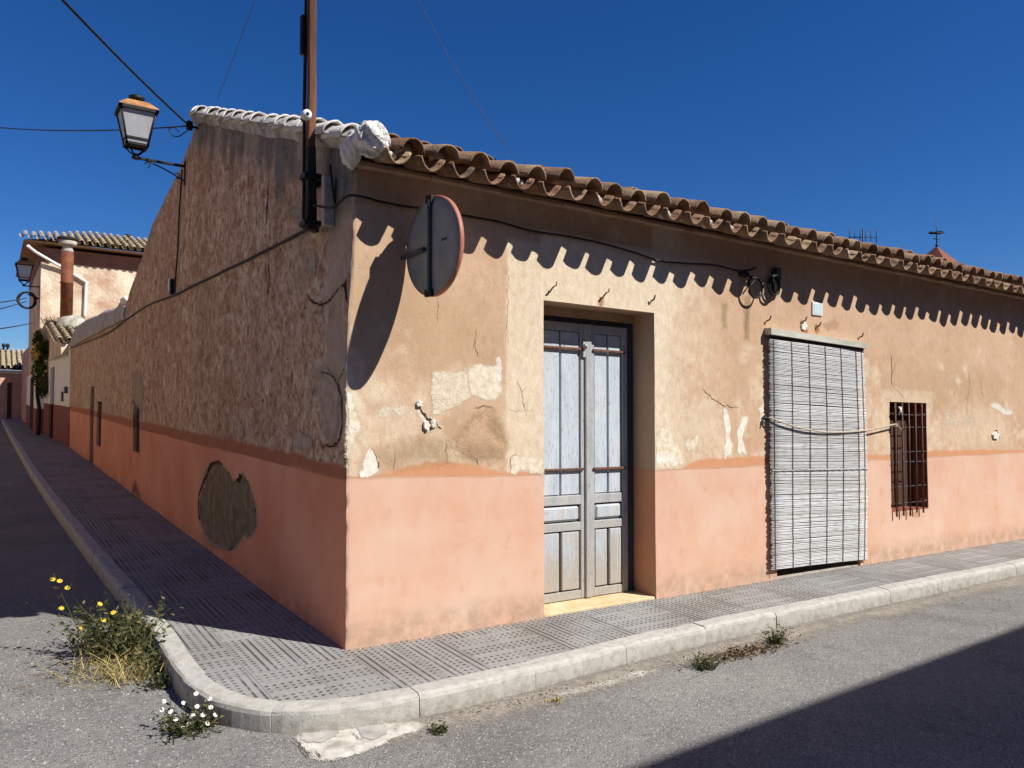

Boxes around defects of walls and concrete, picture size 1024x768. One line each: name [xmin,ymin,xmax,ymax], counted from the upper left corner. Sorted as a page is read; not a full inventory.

crack [320,367,345,448]
flaking render [343,389,379,478]
flaking render [377,357,505,433]
flaking render [655,426,700,469]
peeling [723,404,766,459]
flaking render [198,460,258,555]